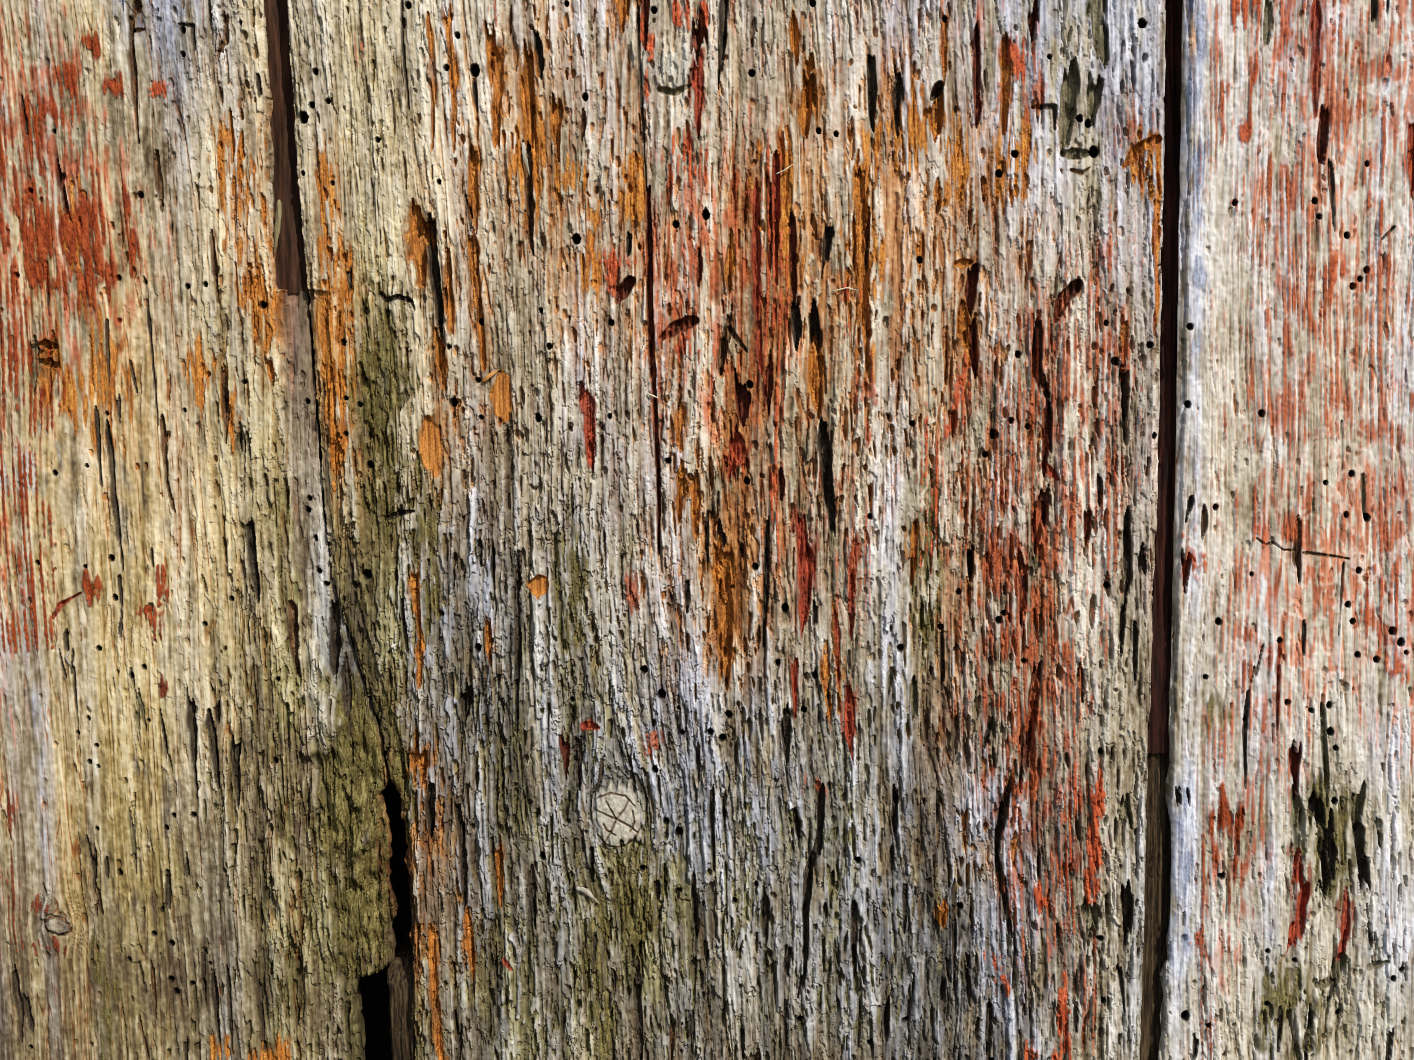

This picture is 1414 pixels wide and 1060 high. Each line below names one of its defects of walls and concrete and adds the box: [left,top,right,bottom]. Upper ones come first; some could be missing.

spalling [102,0,166,144]
hole [867,55,904,139]
spalling [927,0,949,143]
spalling [972,0,1109,159]
peeling [0,61,164,653]
spalling [579,382,596,475]
spalling [599,0,871,765]
spalling [841,166,878,446]
spalling [1200,0,1414,682]
spalling [784,773,827,998]
peeling [904,203,1156,1060]
spalling [1175,474,1382,1060]